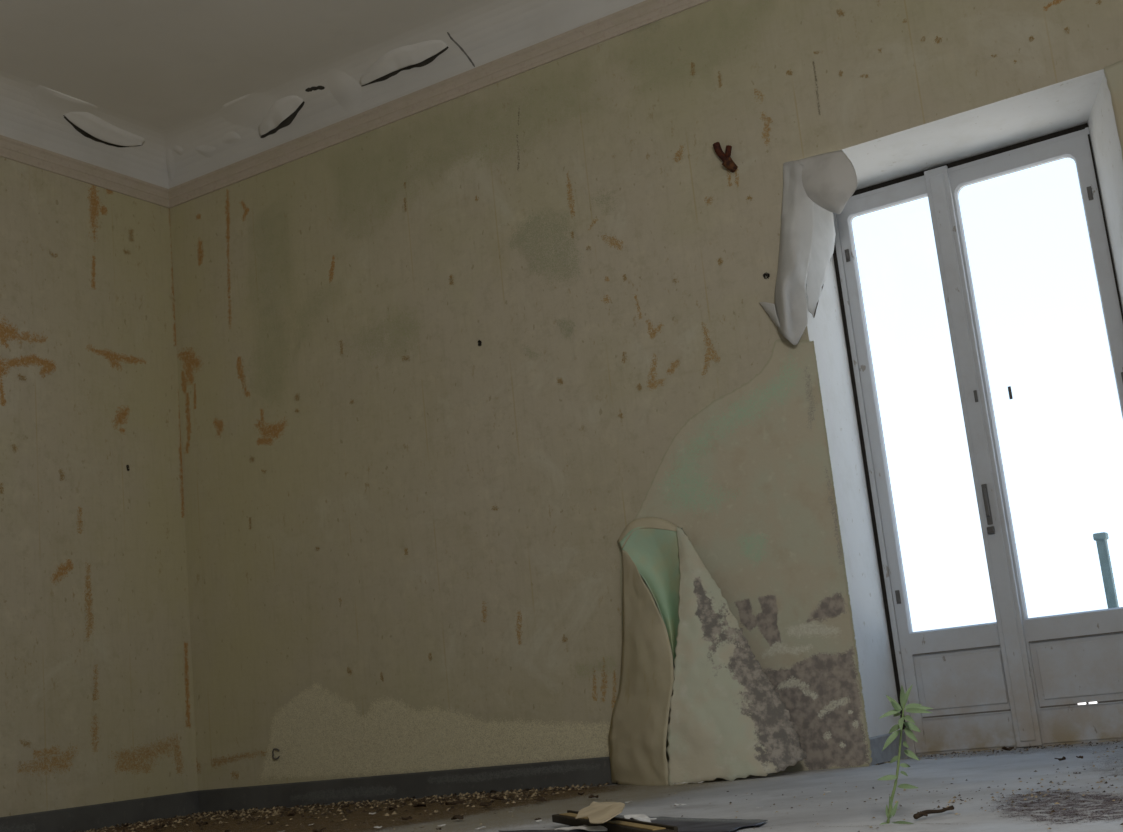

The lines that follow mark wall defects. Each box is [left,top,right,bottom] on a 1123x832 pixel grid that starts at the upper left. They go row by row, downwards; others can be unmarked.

corrosion [0,317,57,406]
corrosion [168,208,204,518]
peeling [633,339,872,773]